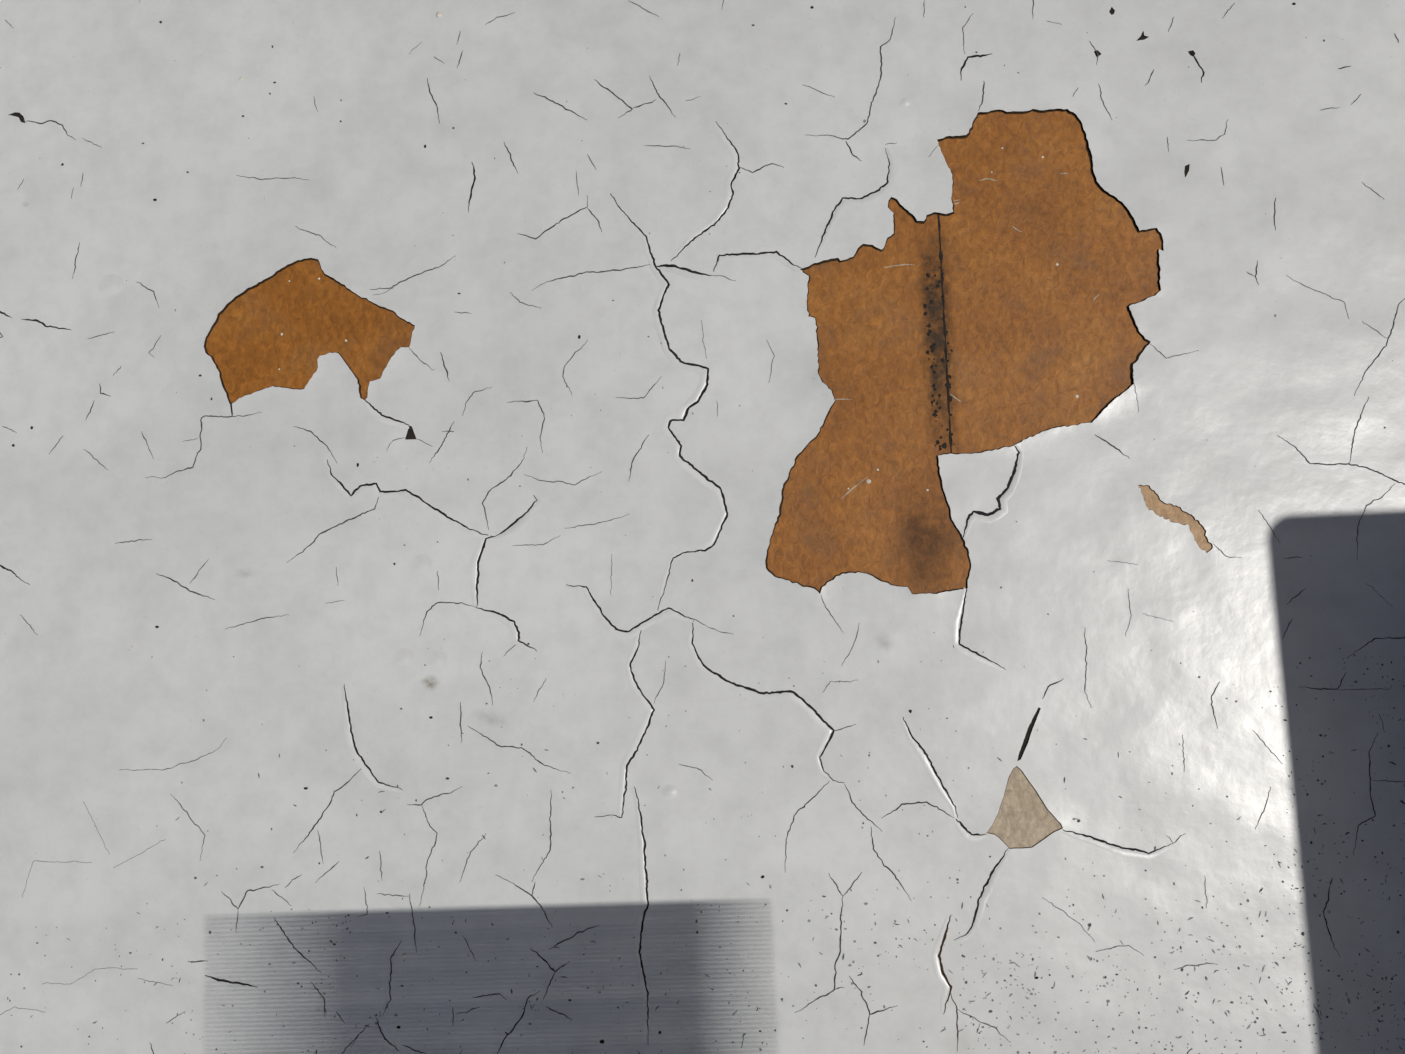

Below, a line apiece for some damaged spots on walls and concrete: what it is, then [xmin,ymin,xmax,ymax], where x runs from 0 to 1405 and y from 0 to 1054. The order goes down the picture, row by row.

crack [0,311,113,339]
peeling [199,258,415,404]
peeling [765,109,1163,594]
crack [141,403,262,478]
crack [288,0,1011,1054]
crack [963,444,1024,538]
peeling [1138,485,1213,553]
crack [1247,261,1405,955]
crack [221,684,462,1054]
peeling [987,707,1063,849]
crack [1062,830,1186,860]
crack [0,960,255,1054]